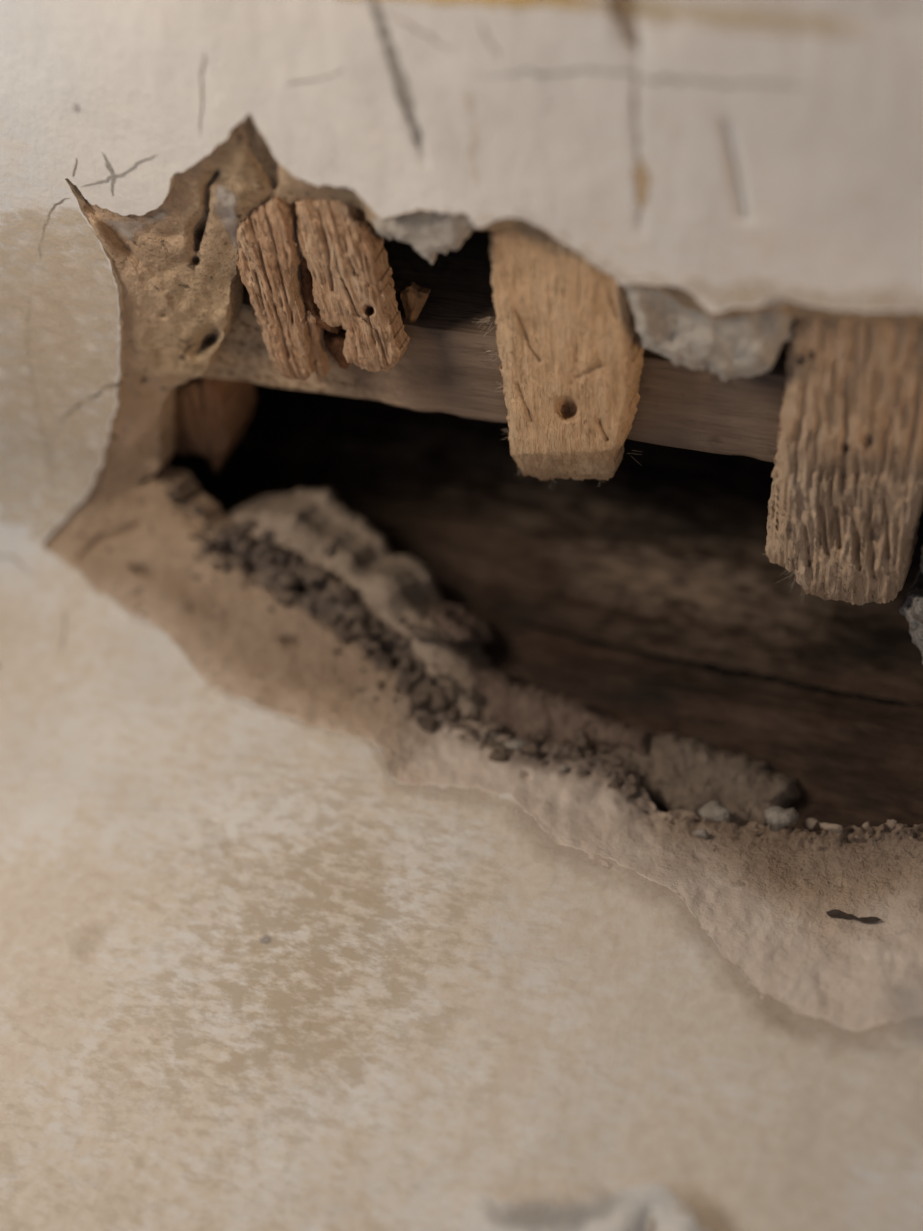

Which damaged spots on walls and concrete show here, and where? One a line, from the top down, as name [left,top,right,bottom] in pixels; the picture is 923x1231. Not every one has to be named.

flaking render [44,114,923,1036]